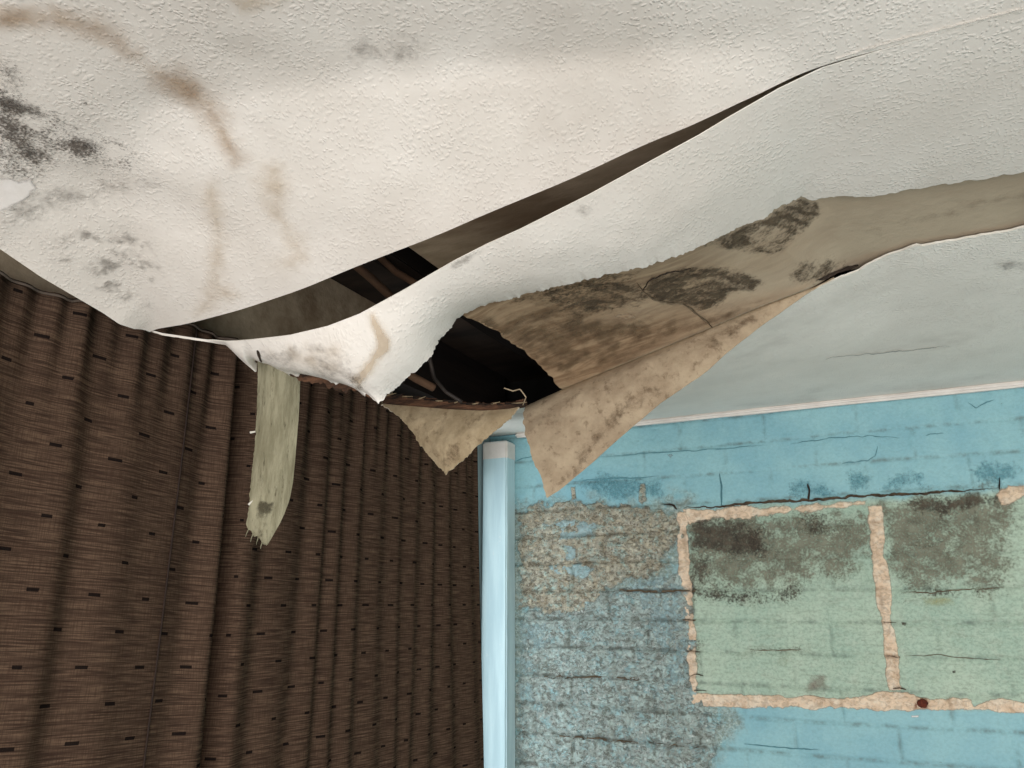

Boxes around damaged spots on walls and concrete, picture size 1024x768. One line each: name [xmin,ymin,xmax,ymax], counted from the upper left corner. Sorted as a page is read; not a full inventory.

water stain [0,89,121,178]
water stain [717,199,818,253]
water stain [795,261,831,282]
peeling [381,277,834,499]
peeling [245,361,300,549]
crack [575,446,1000,510]
water stain [686,510,870,606]
water stain [876,463,1014,602]
peeling [516,574,722,768]